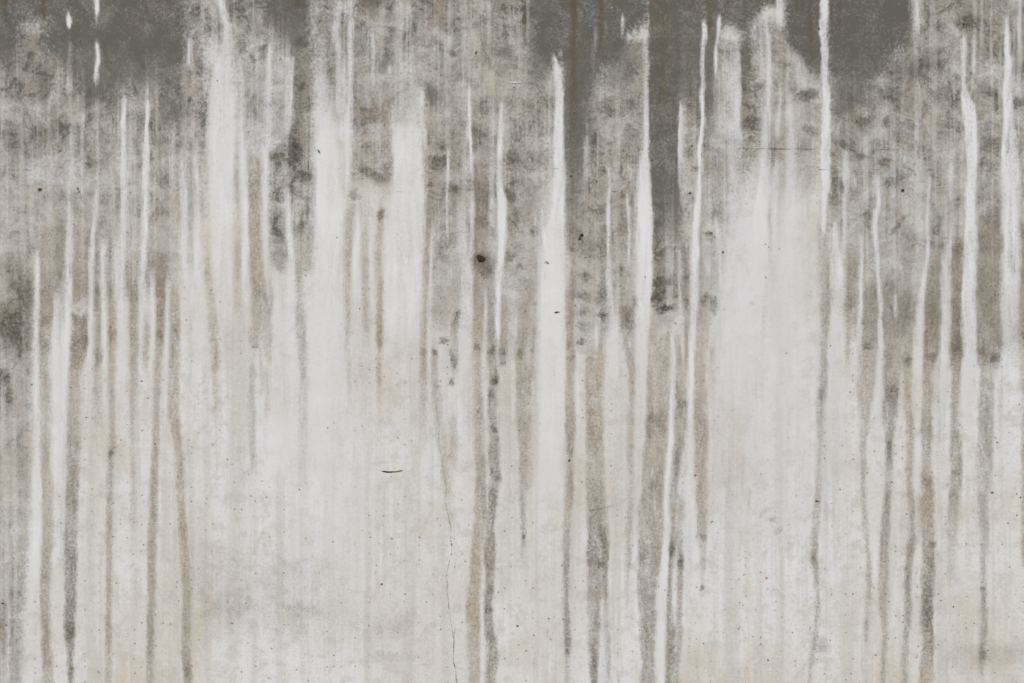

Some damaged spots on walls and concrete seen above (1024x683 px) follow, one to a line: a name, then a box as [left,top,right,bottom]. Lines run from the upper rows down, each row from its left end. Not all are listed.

damp [0,0,517,683]
damp [513,0,1024,683]